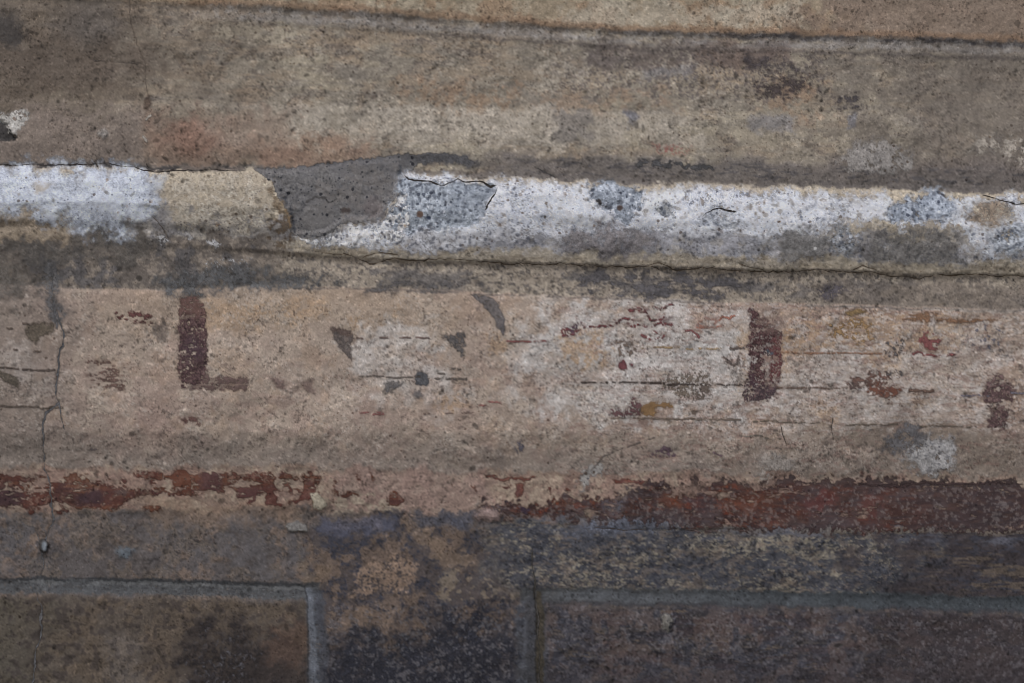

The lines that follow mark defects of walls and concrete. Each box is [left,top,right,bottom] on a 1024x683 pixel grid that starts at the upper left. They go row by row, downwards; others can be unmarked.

damp [415,153,480,169]
damp [636,159,714,171]
crack [404,175,497,210]
damp [300,194,410,248]
damp [563,221,763,301]
crack [307,250,1024,280]
damp [779,226,826,262]
damp [867,228,961,266]
crack [32,265,65,683]